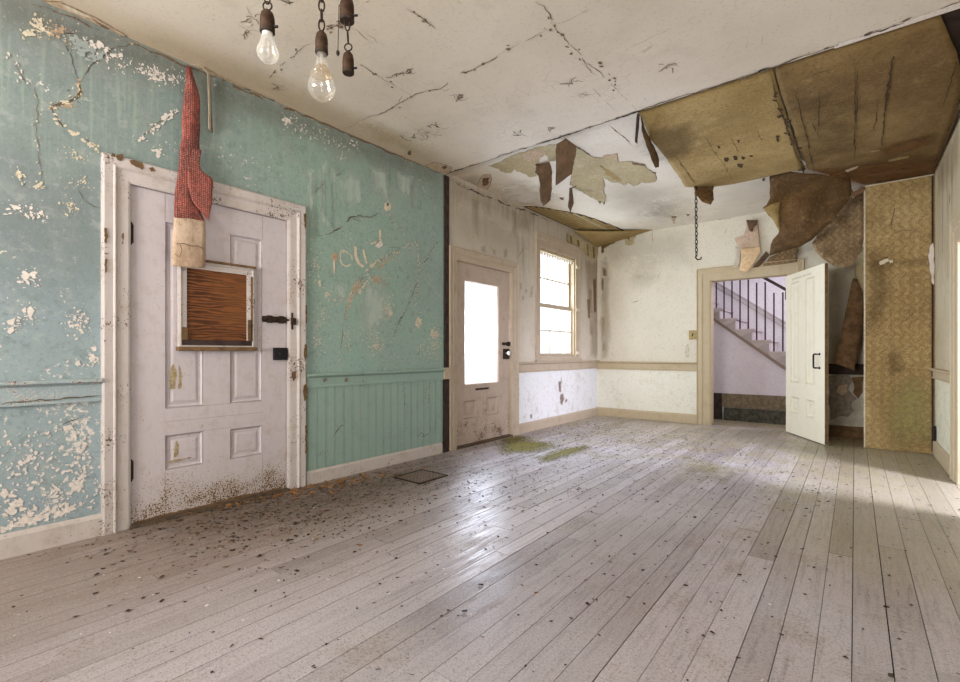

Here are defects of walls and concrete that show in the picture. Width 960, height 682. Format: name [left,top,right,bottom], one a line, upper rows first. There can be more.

peeling [19,0,186,91]
crack [6,2,960,216]
peeling [2,166,48,222]
peeling [477,127,556,190]
peeling [569,147,657,205]
peeling [17,269,41,288]
crack [318,214,435,348]
peeling [2,302,45,334]
peeling [60,307,92,340]
peeling [66,346,99,369]
peeling [837,377,864,399]
peeling [0,421,101,533]